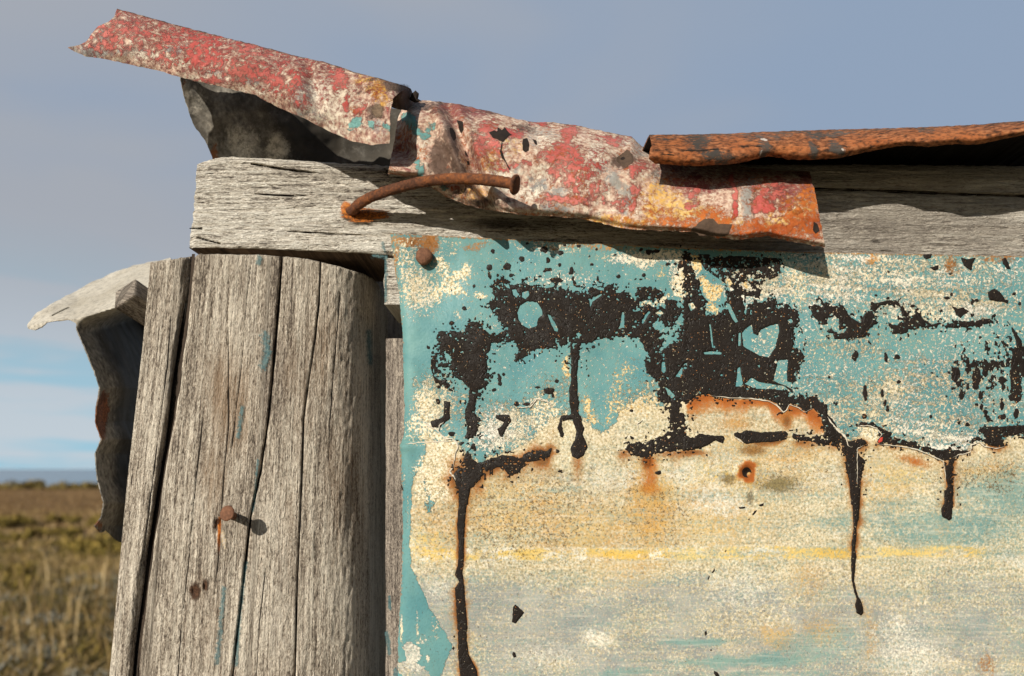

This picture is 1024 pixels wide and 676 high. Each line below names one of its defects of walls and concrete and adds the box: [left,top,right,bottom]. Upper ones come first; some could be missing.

rust [341,201,389,222]
peeling [390,237,488,310]
peeling [641,255,749,315]
crack [232,257,283,676]
crack [295,262,340,676]
peeling [401,385,461,508]
peeling [517,395,568,444]
peeling [581,361,662,429]
rust [686,394,864,553]
peeling [828,418,1002,486]
rust [215,518,226,547]
rust [443,444,557,676]